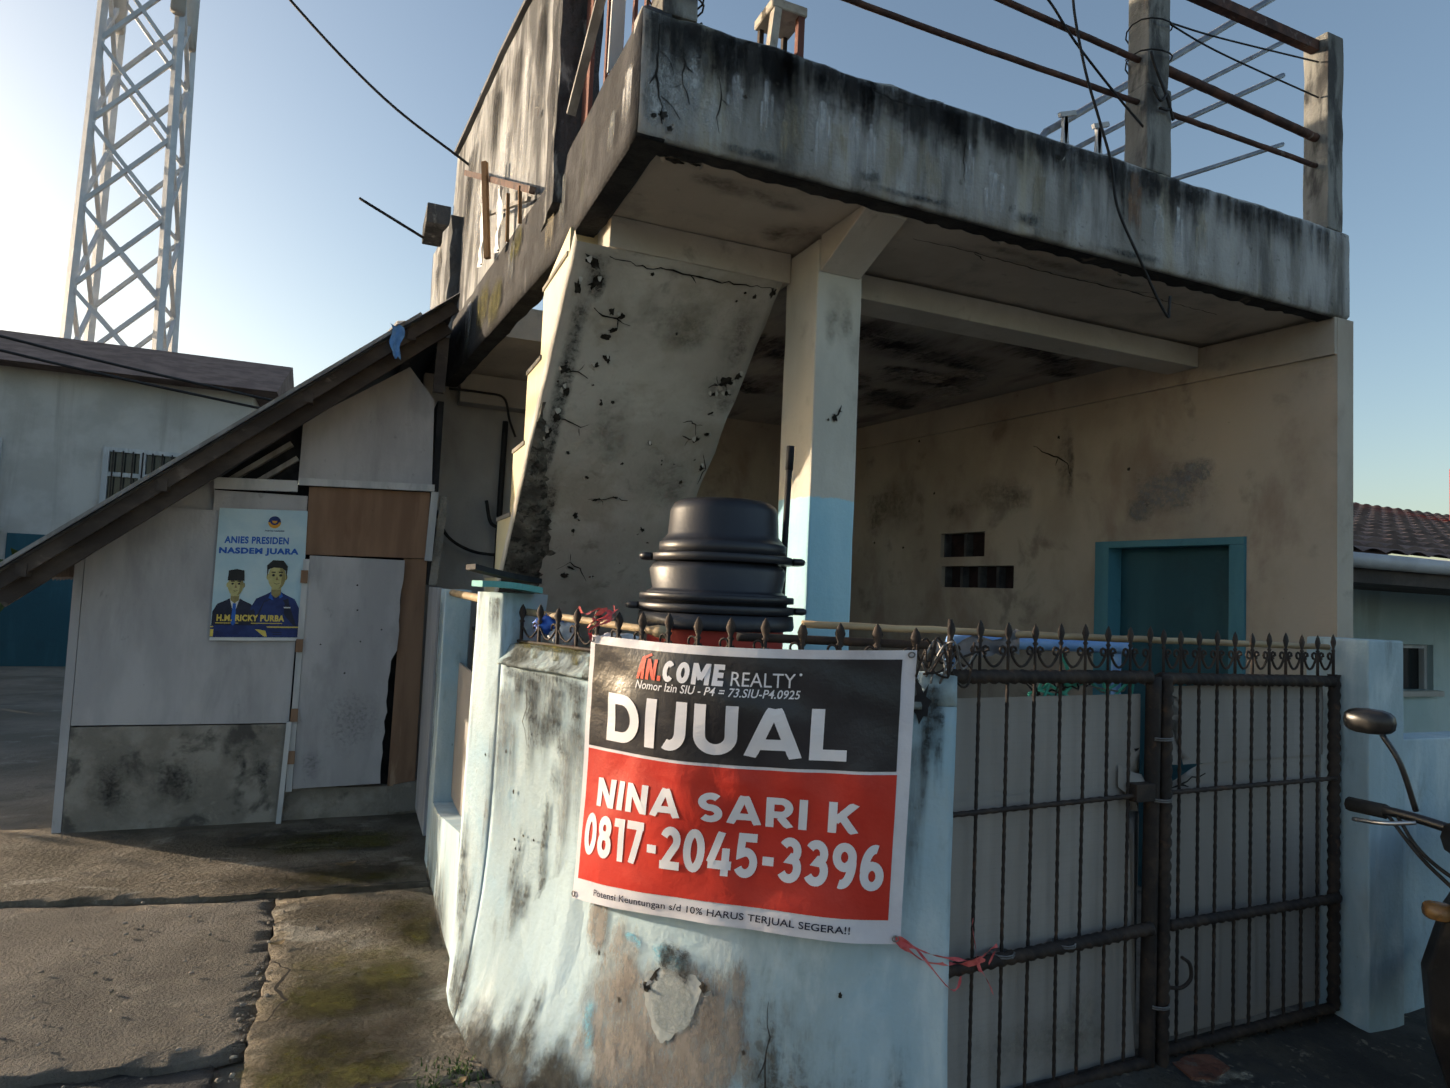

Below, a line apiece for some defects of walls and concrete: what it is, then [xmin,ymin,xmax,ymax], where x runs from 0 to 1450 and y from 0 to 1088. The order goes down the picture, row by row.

water stain [465,0,547,223]
crack [649,23,728,130]
water stain [623,10,1329,252]
spalling [573,253,604,296]
spalling [591,308,625,406]
spalling [708,355,744,416]
spalling [498,364,570,594]
water stain [495,654,590,924]
water stain [427,840,601,1088]
water stain [660,946,688,983]
peeling [573,903,802,1088]